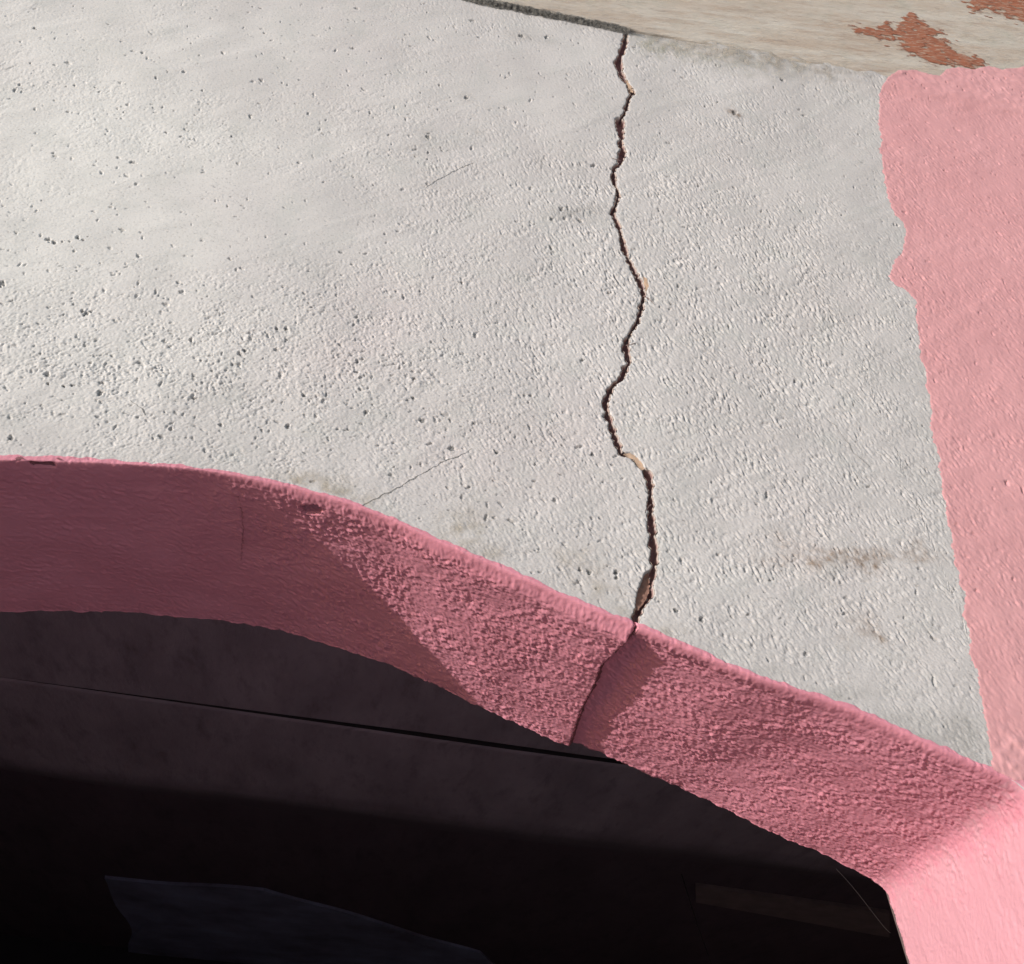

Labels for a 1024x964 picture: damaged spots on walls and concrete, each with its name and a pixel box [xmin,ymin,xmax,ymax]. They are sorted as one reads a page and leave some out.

peeling [851,12,986,69]
peeling [961,0,1024,25]
crack [464,0,659,746]